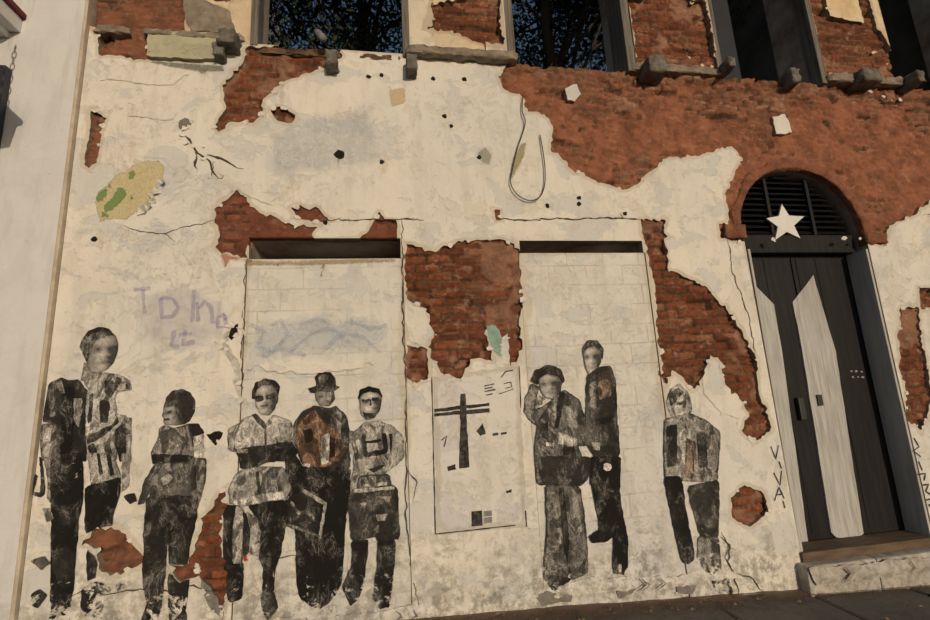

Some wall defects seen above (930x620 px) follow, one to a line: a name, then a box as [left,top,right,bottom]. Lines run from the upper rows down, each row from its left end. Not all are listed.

spalling [94,0,185,60]
spalling [431,0,503,45]
crack [179,126,243,179]
spalling [212,49,326,132]
spalling [500,0,930,243]
spalling [215,188,328,261]
spalling [403,240,526,386]
spalling [641,219,768,443]
spalling [897,288,930,430]
spalling [731,486,771,526]
spalling [85,527,143,574]
spalling [166,487,229,616]